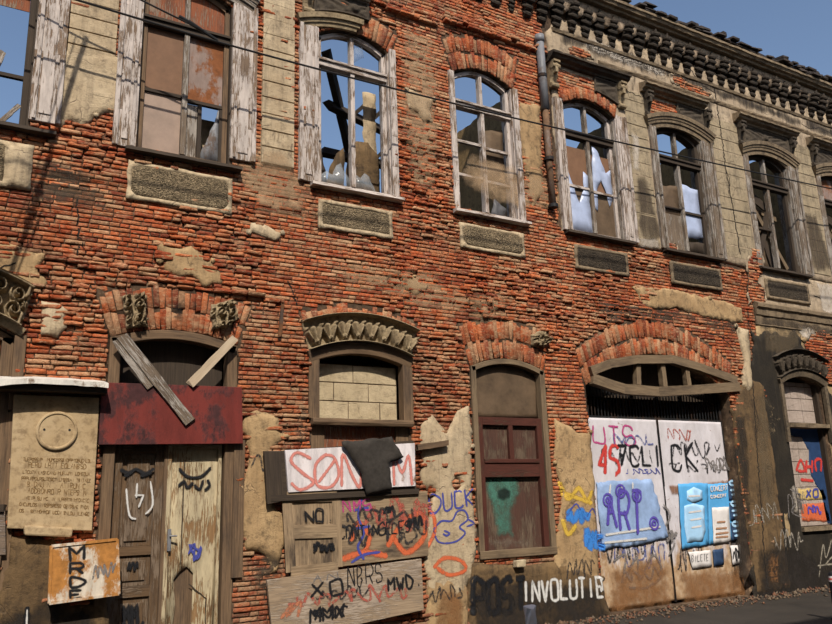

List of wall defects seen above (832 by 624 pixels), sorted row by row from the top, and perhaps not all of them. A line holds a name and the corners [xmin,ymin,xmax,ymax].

peeling [0,243,47,289]
peeling [152,240,223,288]
peeling [246,223,285,241]
crack [677,69,741,255]
peeling [241,410,290,573]
peeling [419,406,610,624]
peeling [631,248,832,588]
water stain [727,418,829,596]